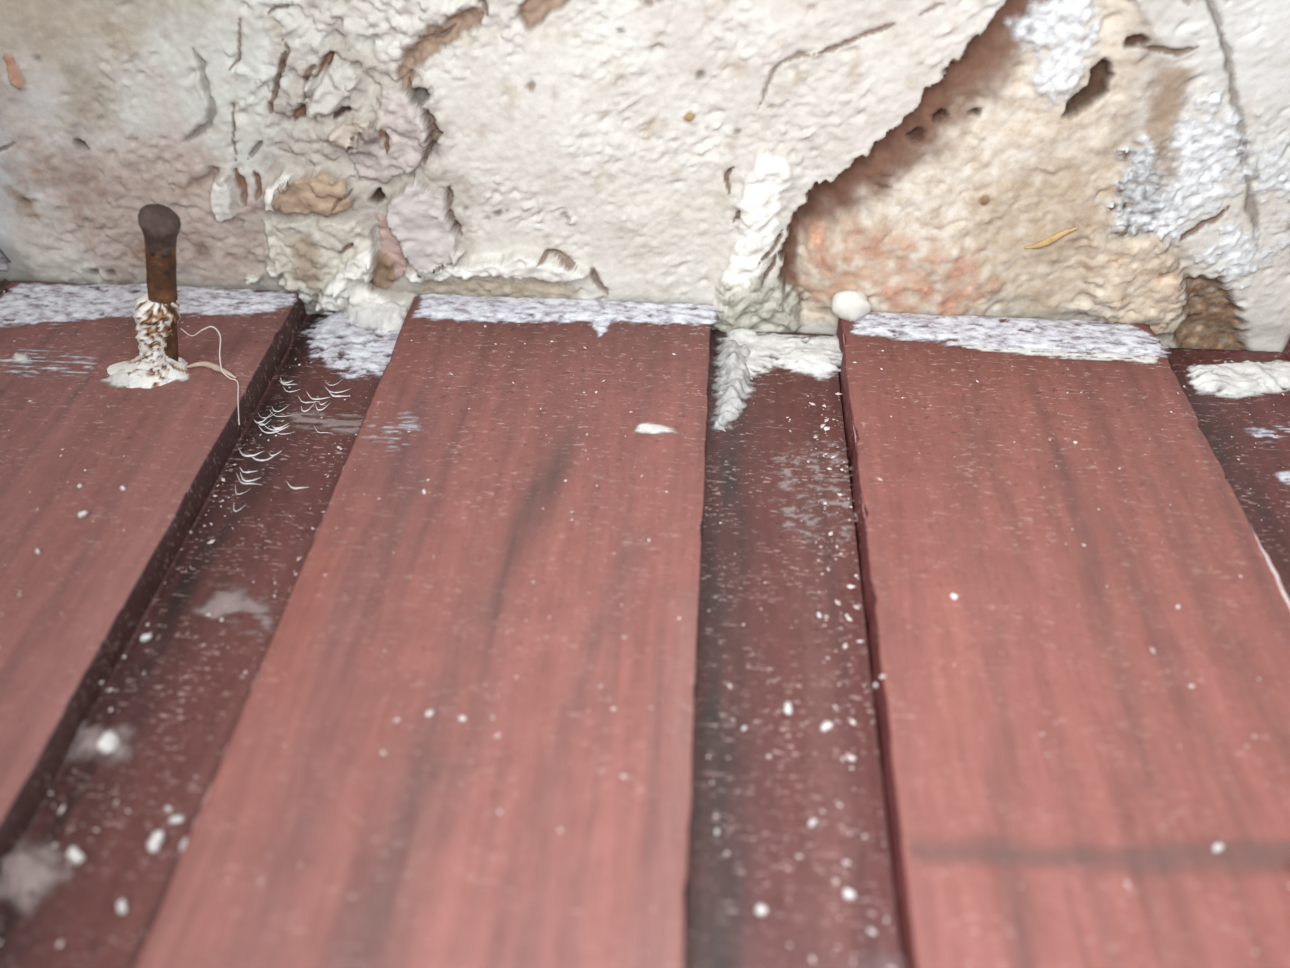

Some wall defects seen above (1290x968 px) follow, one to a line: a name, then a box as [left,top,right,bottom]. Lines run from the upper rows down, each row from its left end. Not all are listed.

spalling [519,0,567,28]
flaking render [210,178,232,223]
flaking render [249,40,462,312]
spalling [778,0,1245,350]
leakage [1109,92,1290,289]